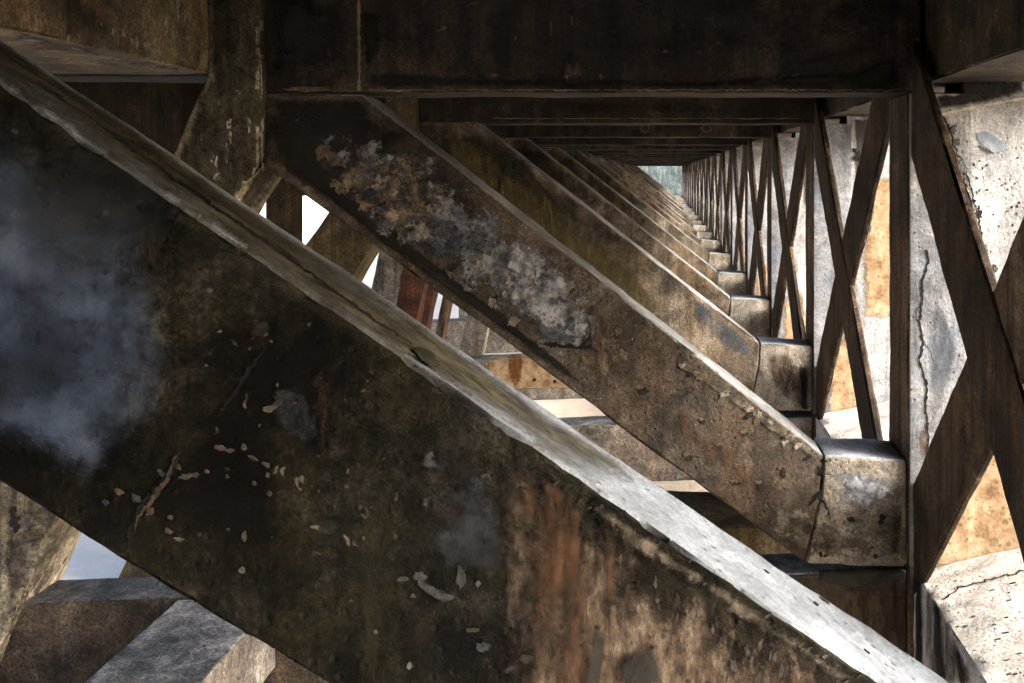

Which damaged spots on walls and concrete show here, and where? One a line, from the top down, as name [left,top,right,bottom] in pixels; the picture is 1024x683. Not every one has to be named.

peeling [263,391,316,439]
peeling [315,133,628,381]
rust [540,484,584,683]
crack [809,459,831,519]
crack [915,250,934,453]
crack [942,569,1024,675]